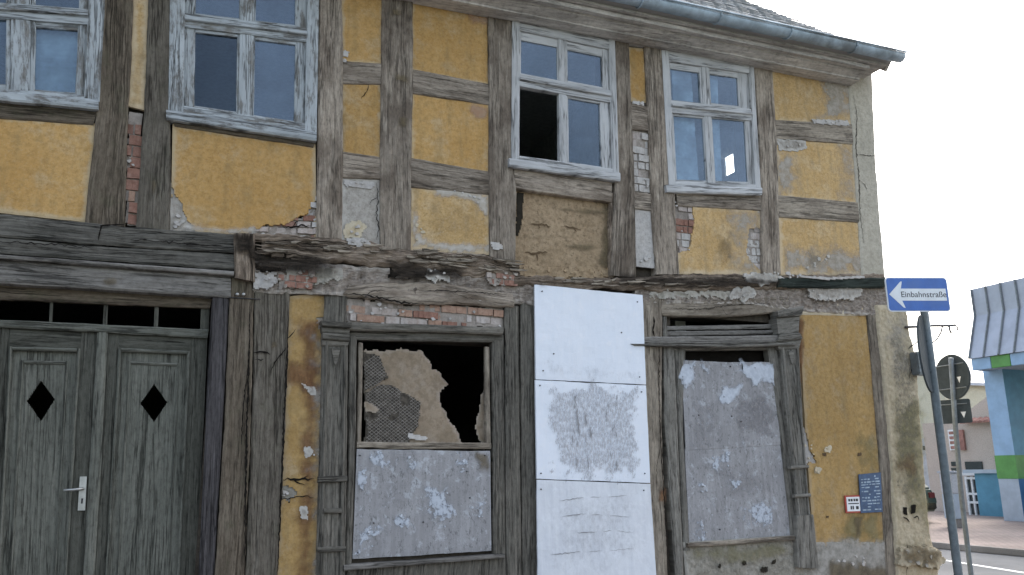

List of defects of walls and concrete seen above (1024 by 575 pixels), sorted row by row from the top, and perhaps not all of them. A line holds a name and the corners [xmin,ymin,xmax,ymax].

flaking render [125,112,143,227]
flaking render [632,130,650,194]
crack [856,109,874,240]
spalling [170,188,200,231]
flaking render [216,197,343,290]
flaking render [675,201,694,253]
spalling [649,228,865,304]
flaking render [346,299,504,327]
crack [282,476,314,500]